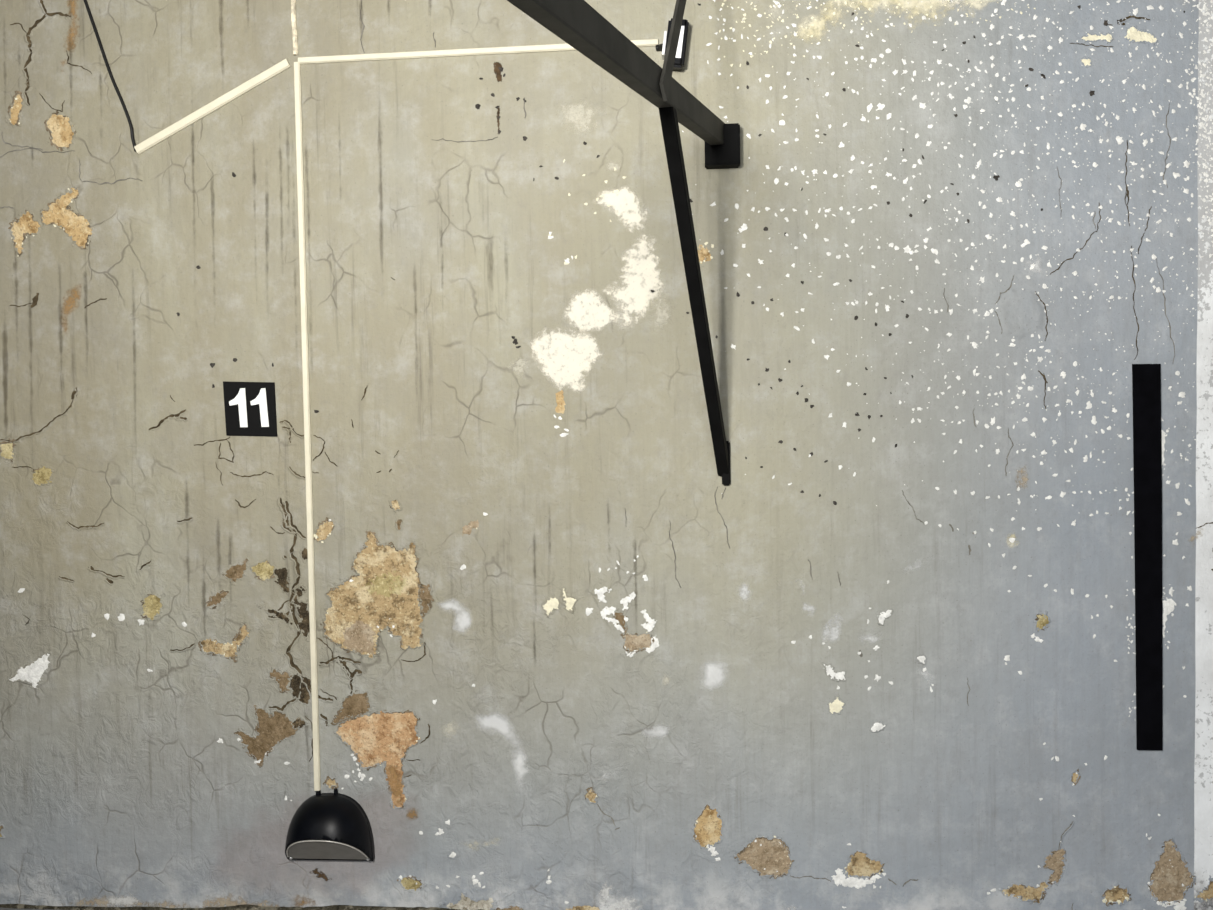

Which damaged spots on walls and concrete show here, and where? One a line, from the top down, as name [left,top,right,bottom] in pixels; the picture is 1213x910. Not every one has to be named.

crack [10,0,71,112]
crack [0,137,142,185]
damp [514,163,668,391]
crack [66,521,105,531]
crack [58,560,154,586]
crack [148,395,362,762]
peeling [205,498,435,660]
peeling [541,555,659,657]
peeling [217,666,312,767]
peeling [323,689,422,810]
peeling [691,804,795,879]
peeling [1101,833,1213,910]